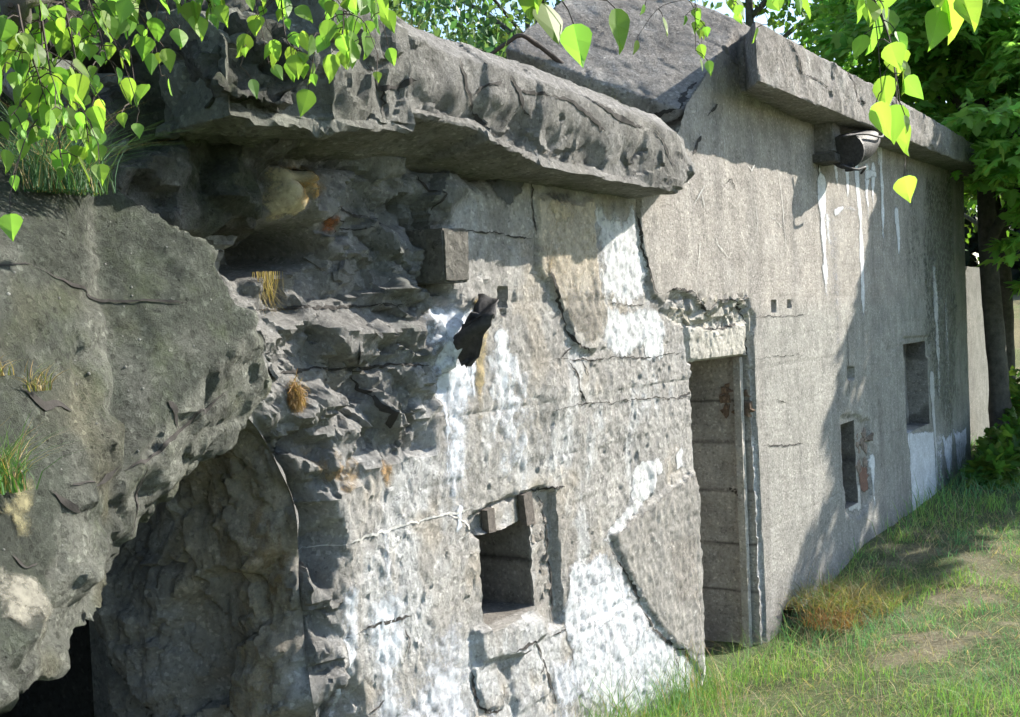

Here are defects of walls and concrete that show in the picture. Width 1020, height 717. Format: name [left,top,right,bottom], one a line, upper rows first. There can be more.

crack [466,184,691,414]
peeling [568,204,690,361]
spalling [701,294,723,328]
water stain [817,147,957,484]
water stain [426,307,476,532]
water stain [488,329,528,472]
crack [298,507,477,554]
crack [606,537,691,667]
crack [471,666,505,714]